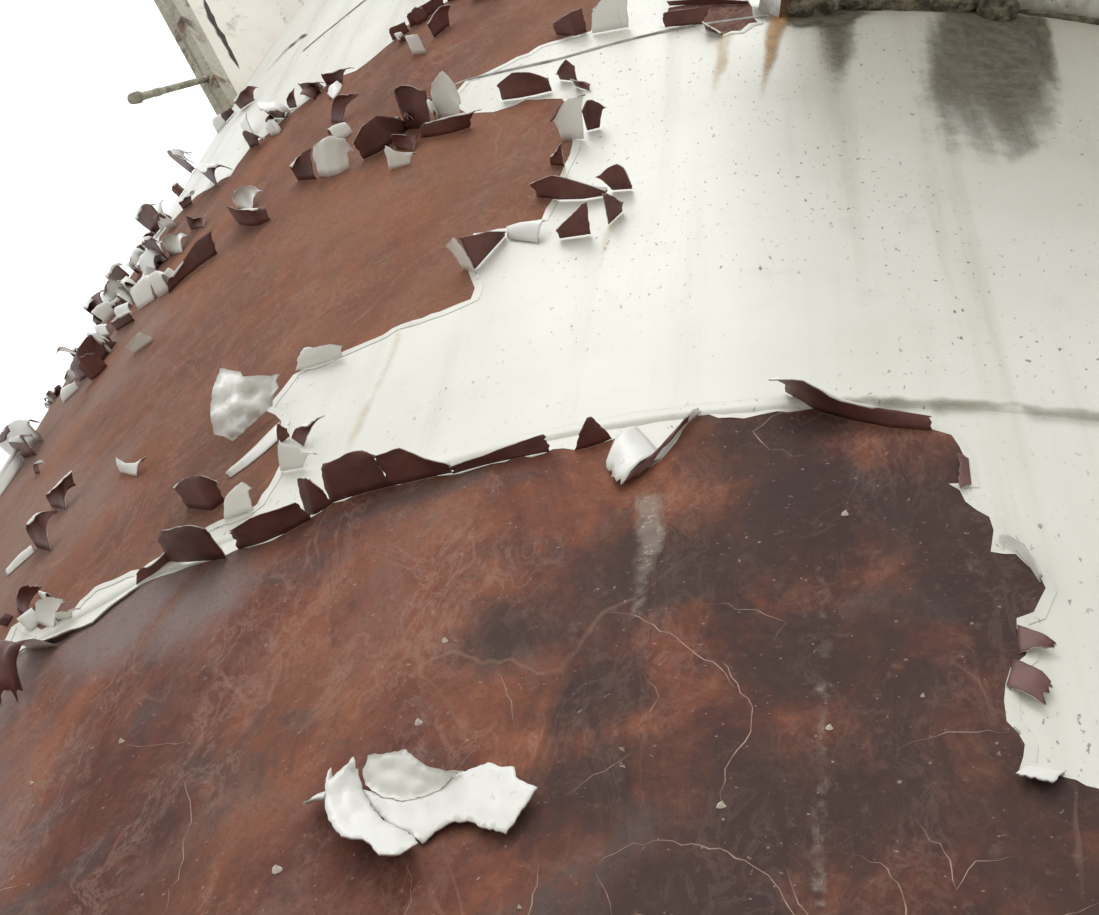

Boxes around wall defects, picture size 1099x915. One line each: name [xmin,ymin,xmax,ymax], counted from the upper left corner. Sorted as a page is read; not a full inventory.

water stain [931,11,1054,145]
peeling [0,0,633,641]
peeling [0,377,1099,915]
crack [602,611,753,798]
crack [707,603,787,640]
crack [164,783,192,914]
crack [596,840,808,915]
crack [856,855,907,915]
crack [916,821,1018,890]